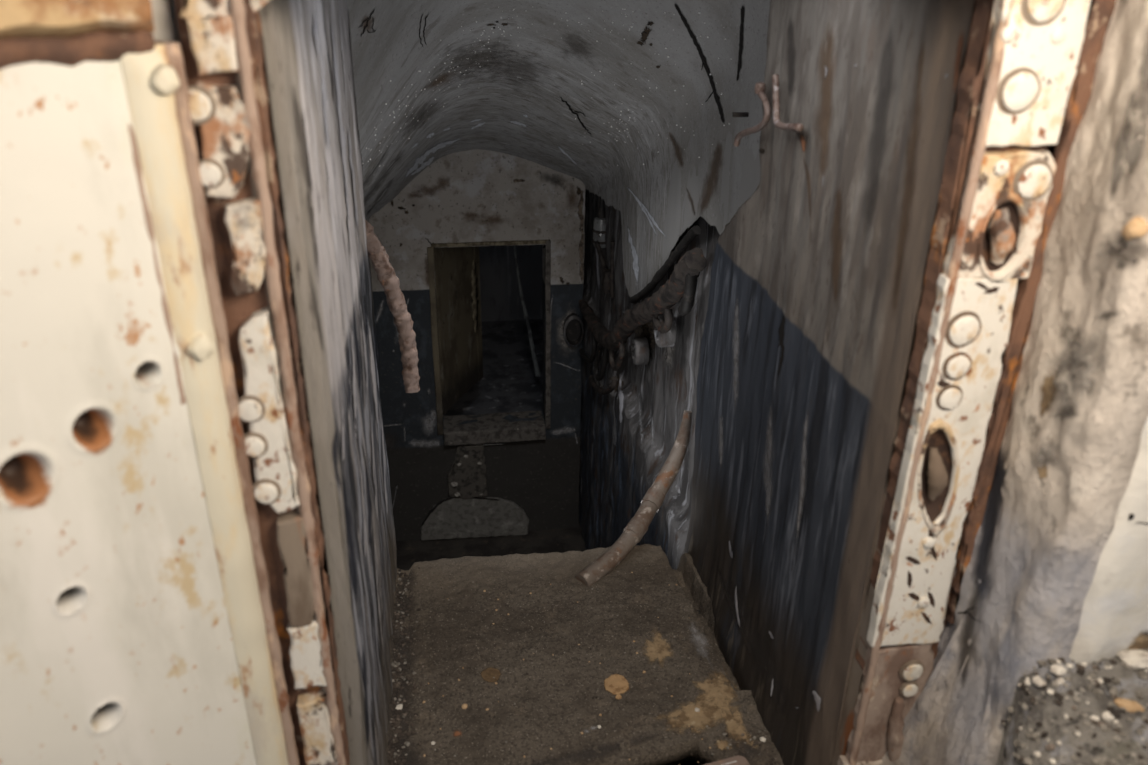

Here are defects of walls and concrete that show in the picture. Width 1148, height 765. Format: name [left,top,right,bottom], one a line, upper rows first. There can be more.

crack [561,97,591,134]
leakage [646,633,671,663]
leakage [604,674,629,700]
leakage [659,673,757,756]